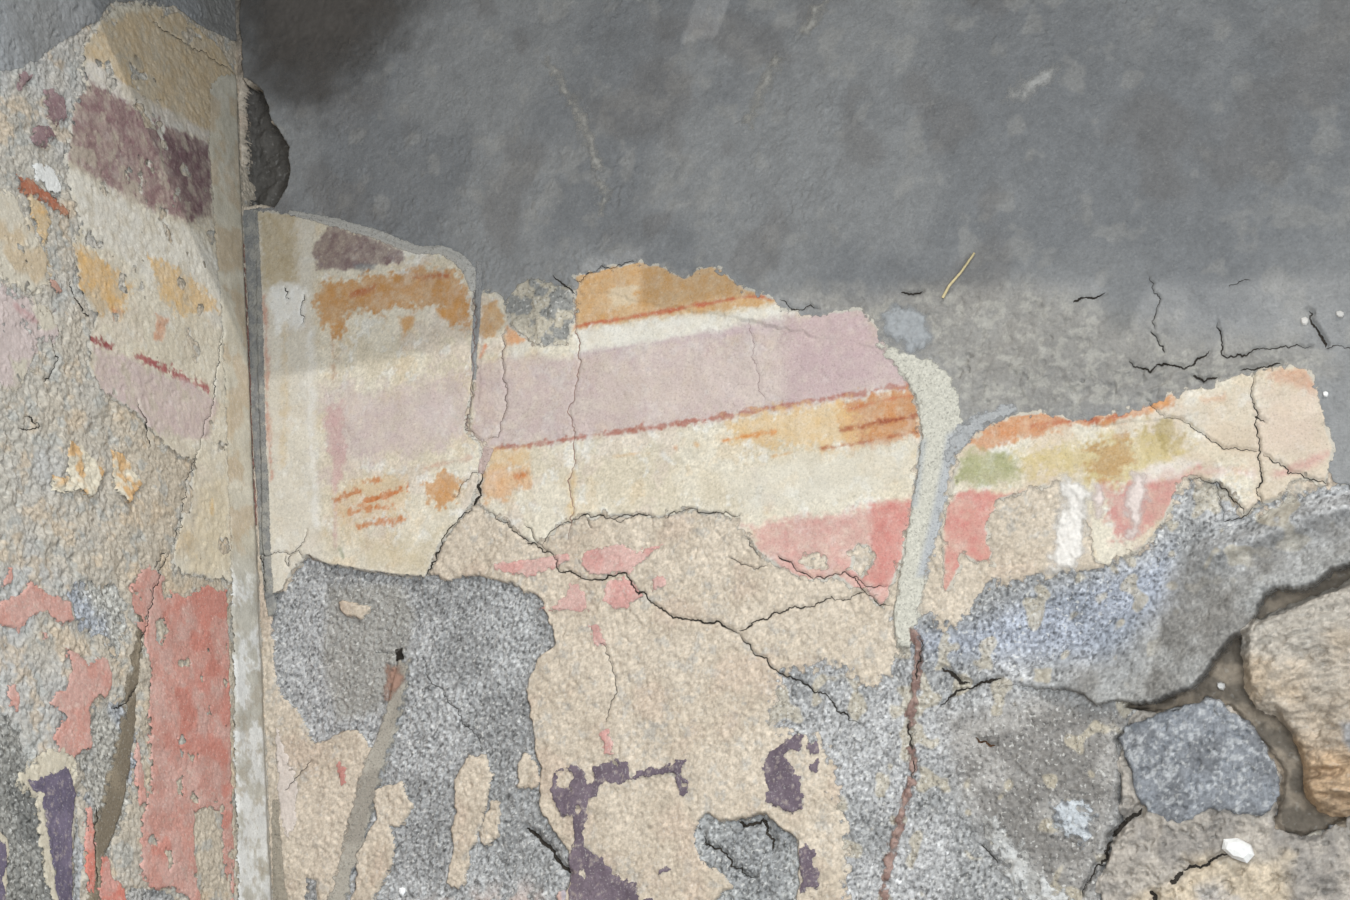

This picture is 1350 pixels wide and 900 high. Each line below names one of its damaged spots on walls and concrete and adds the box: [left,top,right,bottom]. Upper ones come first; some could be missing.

peeling [0,70,70,392]
peeling [50,440,143,503]
spalling [504,278,578,347]
crack [427,261,1001,724]
crack [1073,293,1105,303]
crack [1129,279,1350,522]
peeling [0,566,236,900]
spalling [270,544,689,900]
crack [907,724,916,778]
spalling [694,478,1350,900]